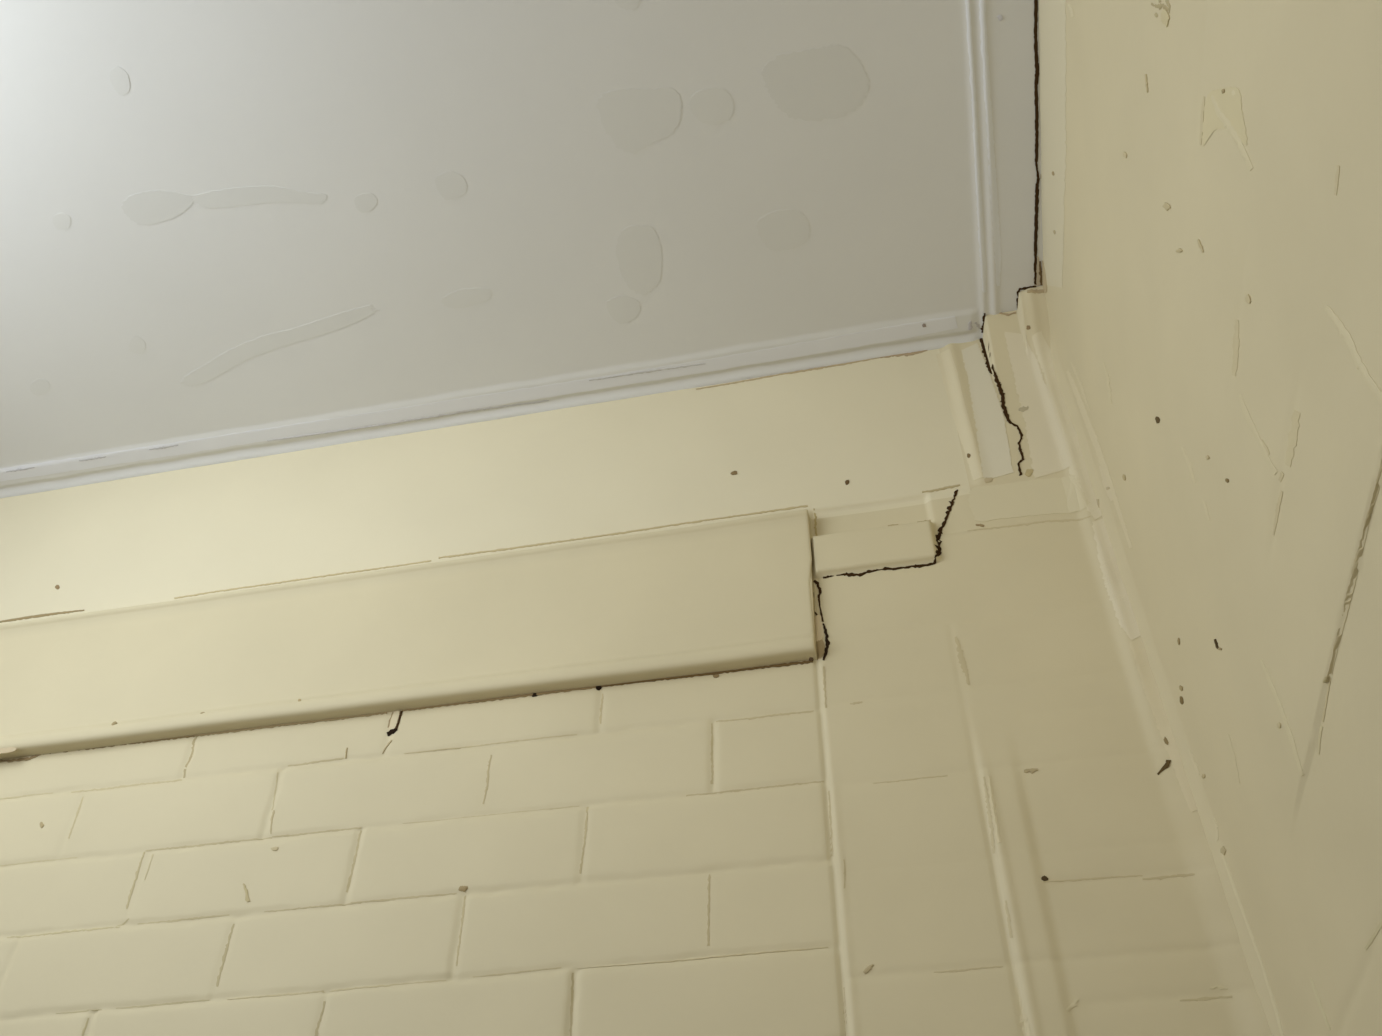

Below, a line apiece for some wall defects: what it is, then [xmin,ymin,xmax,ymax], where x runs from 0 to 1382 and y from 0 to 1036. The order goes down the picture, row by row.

crack [979,0,1042,476]
crack [0,484,1091,1036]